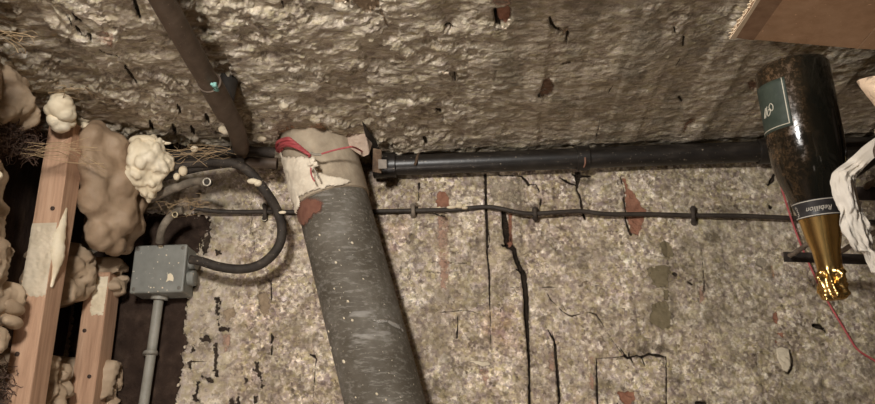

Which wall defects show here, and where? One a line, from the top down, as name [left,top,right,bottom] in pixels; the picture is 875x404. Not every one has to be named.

flaking render [493,0,511,30]
flaking render [622,178,646,236]
crack [418,172,667,404]
flaking render [617,391,636,404]